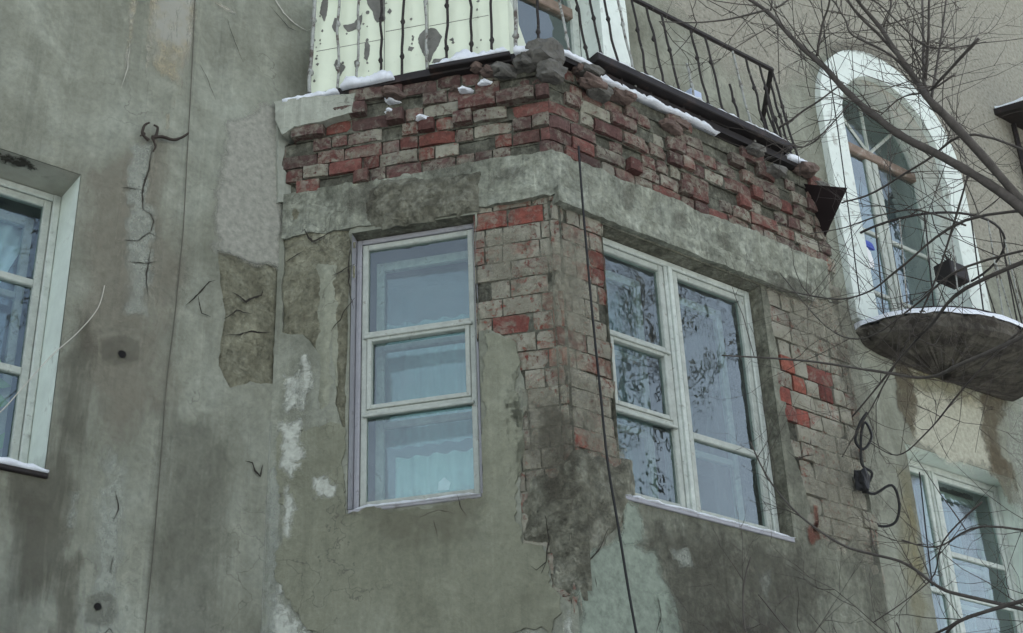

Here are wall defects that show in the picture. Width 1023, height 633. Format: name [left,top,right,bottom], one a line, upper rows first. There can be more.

peeling [314,0,392,76]
peeling [408,28,455,63]
crack [122,149,158,293]
flaking render [218,231,356,428]
flaking render [271,37,895,633]